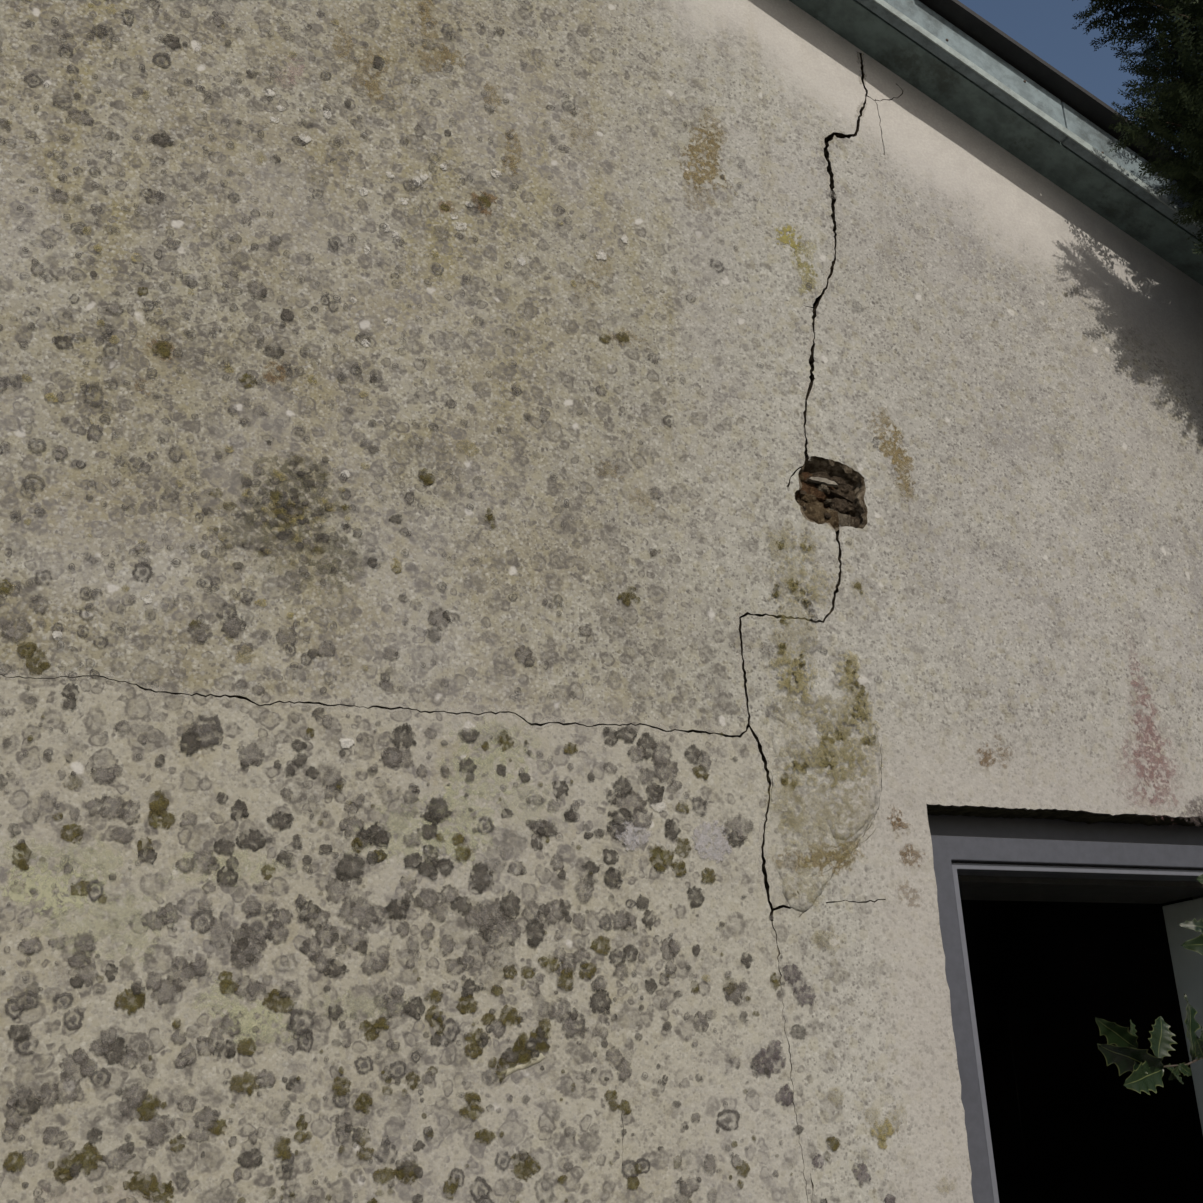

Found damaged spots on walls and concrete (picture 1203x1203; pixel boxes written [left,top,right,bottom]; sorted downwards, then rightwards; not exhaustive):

crack [787,52,903,487]
spalling [790,456,868,533]
leakage [1,864,106,916]
crack [0,527,886,1200]
leakage [224,1001,282,1038]